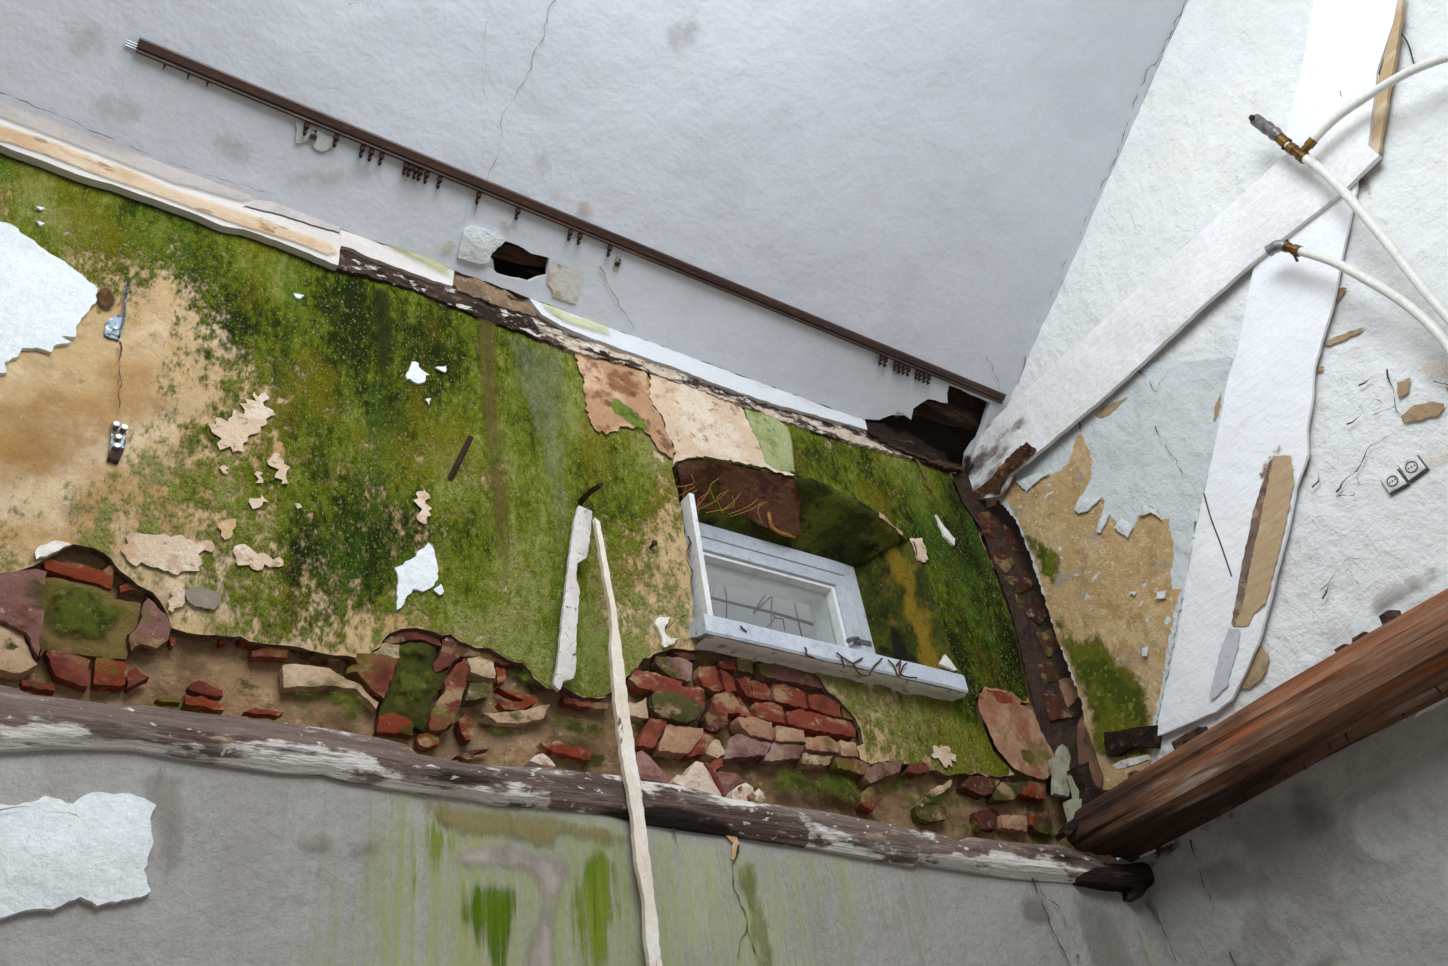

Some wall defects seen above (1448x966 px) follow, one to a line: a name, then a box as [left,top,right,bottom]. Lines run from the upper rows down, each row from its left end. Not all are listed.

crack [464,0,555,218]
peeling [0,206,98,376]
flaking render [208,392,275,474]
peeling [405,362,447,406]
spalling [575,353,803,535]
flaking render [0,518,283,696]
peeling [394,542,444,611]
spalling [625,357,1232,838]
flaking render [216,630,609,764]
peeling [0,792,156,921]
leakage [459,846,565,966]
crack [1032,878,1075,965]